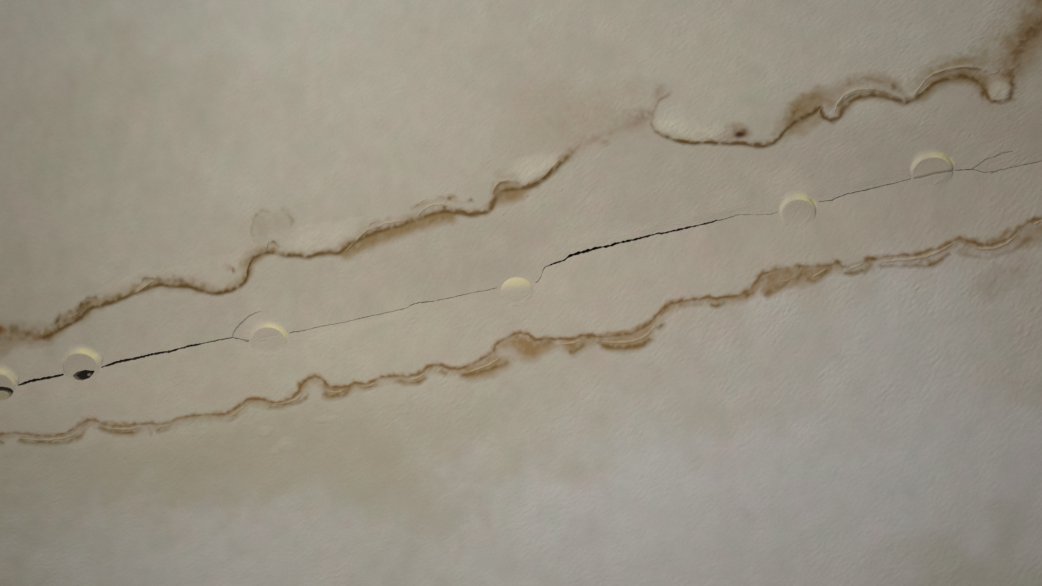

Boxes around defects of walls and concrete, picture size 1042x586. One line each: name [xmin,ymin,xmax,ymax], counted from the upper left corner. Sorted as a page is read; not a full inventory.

leakage [35,0,1042,342]
crack [819,179,909,202]
crack [955,151,1040,174]
crack [536,212,777,283]
crack [290,288,495,333]
crack [104,311,261,367]
crack [21,374,64,385]